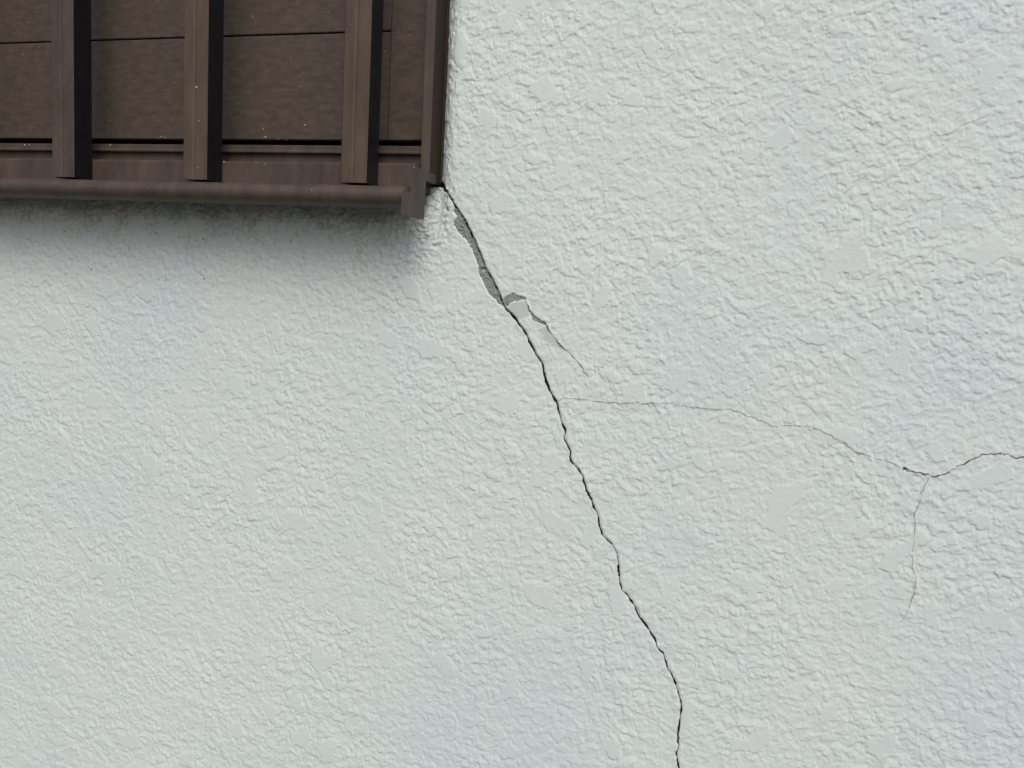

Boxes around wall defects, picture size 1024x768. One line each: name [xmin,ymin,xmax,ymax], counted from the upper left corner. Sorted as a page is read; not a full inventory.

spalling [446,207,561,348]
crack [443,183,1024,768]